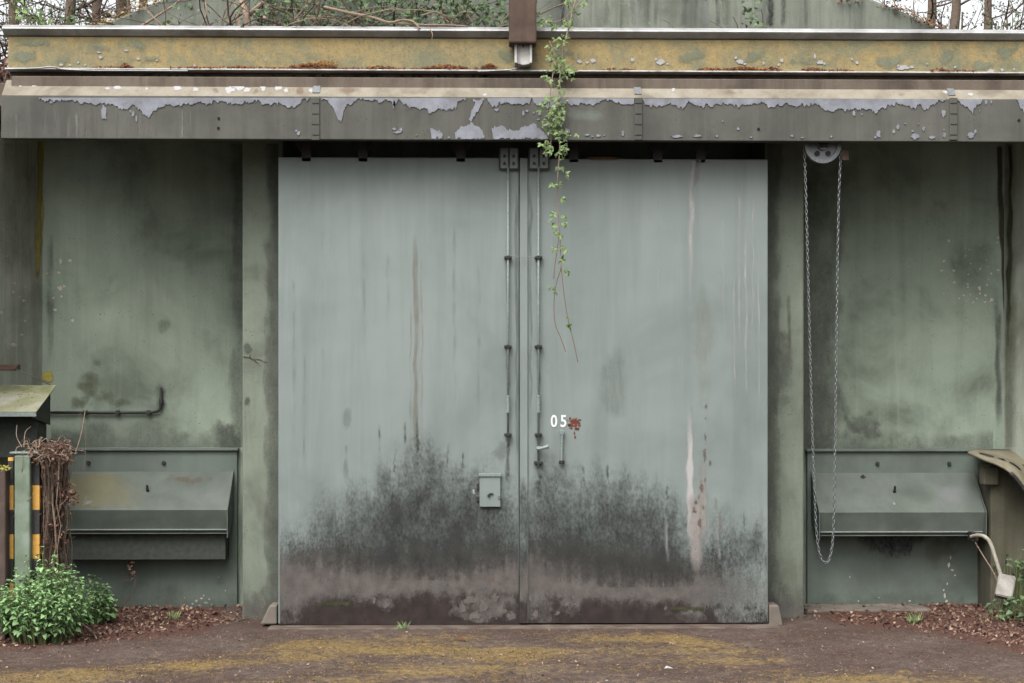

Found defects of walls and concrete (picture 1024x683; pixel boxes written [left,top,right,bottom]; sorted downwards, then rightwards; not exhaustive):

peeling [19,85,992,140]
leakage [314,144,790,623]
rust [567,417,581,438]
leakage [804,273,839,449]